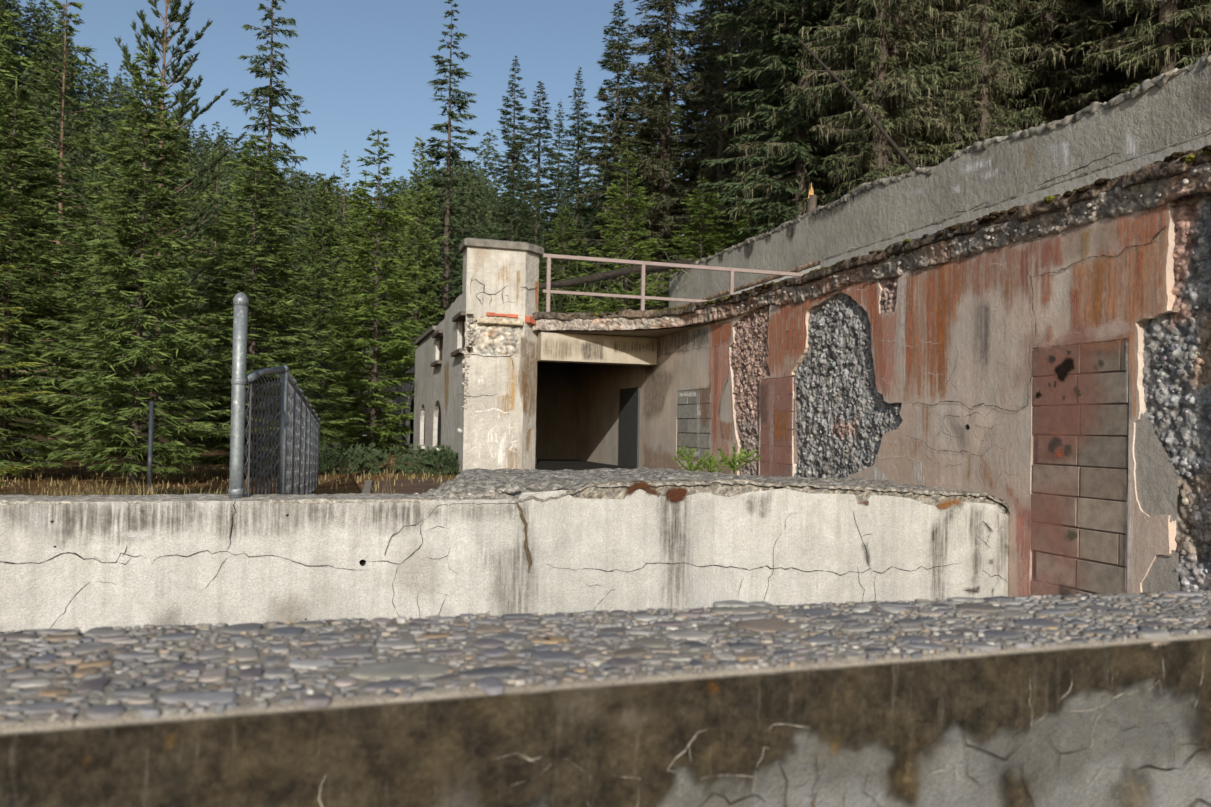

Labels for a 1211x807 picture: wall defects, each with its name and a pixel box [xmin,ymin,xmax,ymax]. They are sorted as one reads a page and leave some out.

spalling [461,162,1211,593]
corrosion [760,204,1166,472]
crack [5,502,456,628]
crack [517,503,532,571]
corrosion [627,481,688,502]
crack [584,512,941,608]